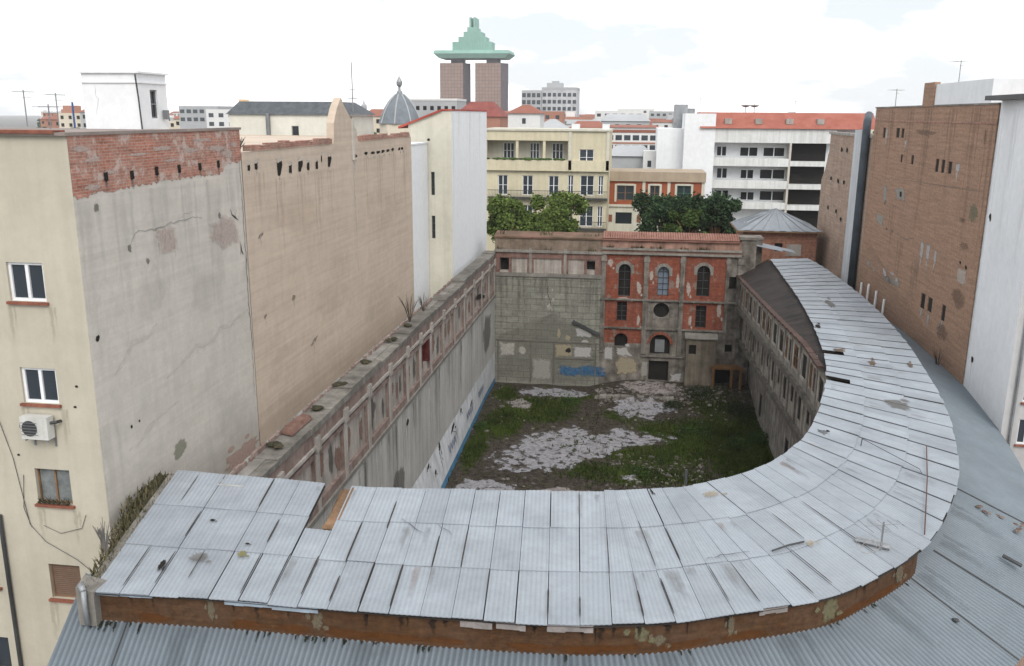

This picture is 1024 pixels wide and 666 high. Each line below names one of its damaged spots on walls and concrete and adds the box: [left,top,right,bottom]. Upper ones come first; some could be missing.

spalling [67,130,258,200]
crack [127,212,202,247]
peeling [532,328,592,379]
spalling [604,344,647,376]
peeling [225,434,258,471]
corrosion [837,569,897,619]
corrosion [232,605,258,628]
corrosion [327,614,410,641]